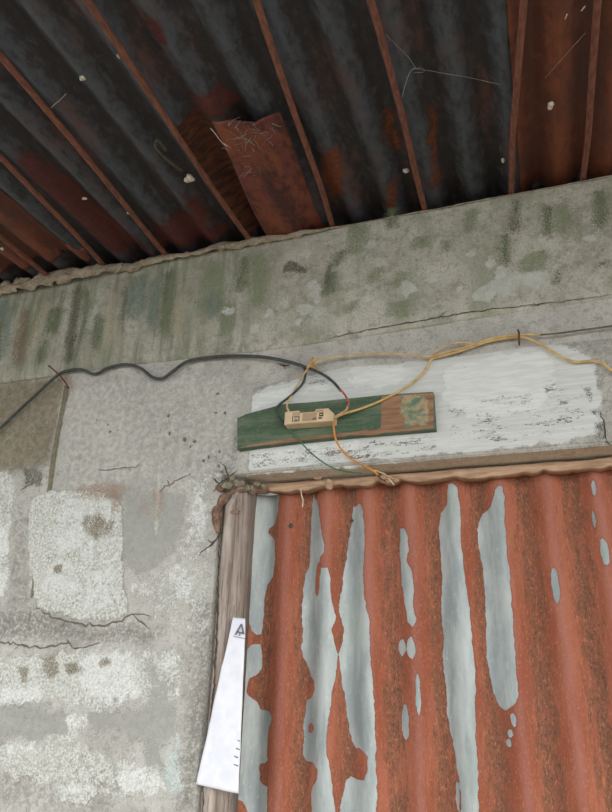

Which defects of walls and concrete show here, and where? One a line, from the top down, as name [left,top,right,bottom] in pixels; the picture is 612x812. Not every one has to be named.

rust [176,110,260,236]
damp [0,224,377,368]
damp [342,265,440,319]
crack [328,295,607,339]
damp [485,190,610,285]
crack [0,608,149,649]
peeling [0,343,605,812]
rust [246,470,612,812]